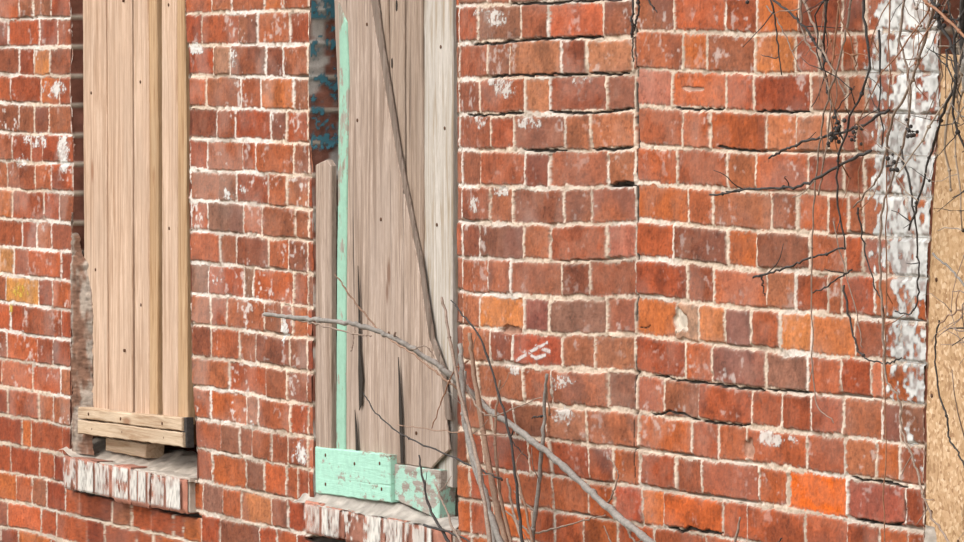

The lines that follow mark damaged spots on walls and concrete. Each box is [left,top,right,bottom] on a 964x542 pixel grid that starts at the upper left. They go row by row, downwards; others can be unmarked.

crack [633,28,641,222]
peeling [864,0,941,404]
crack [634,410,750,478]